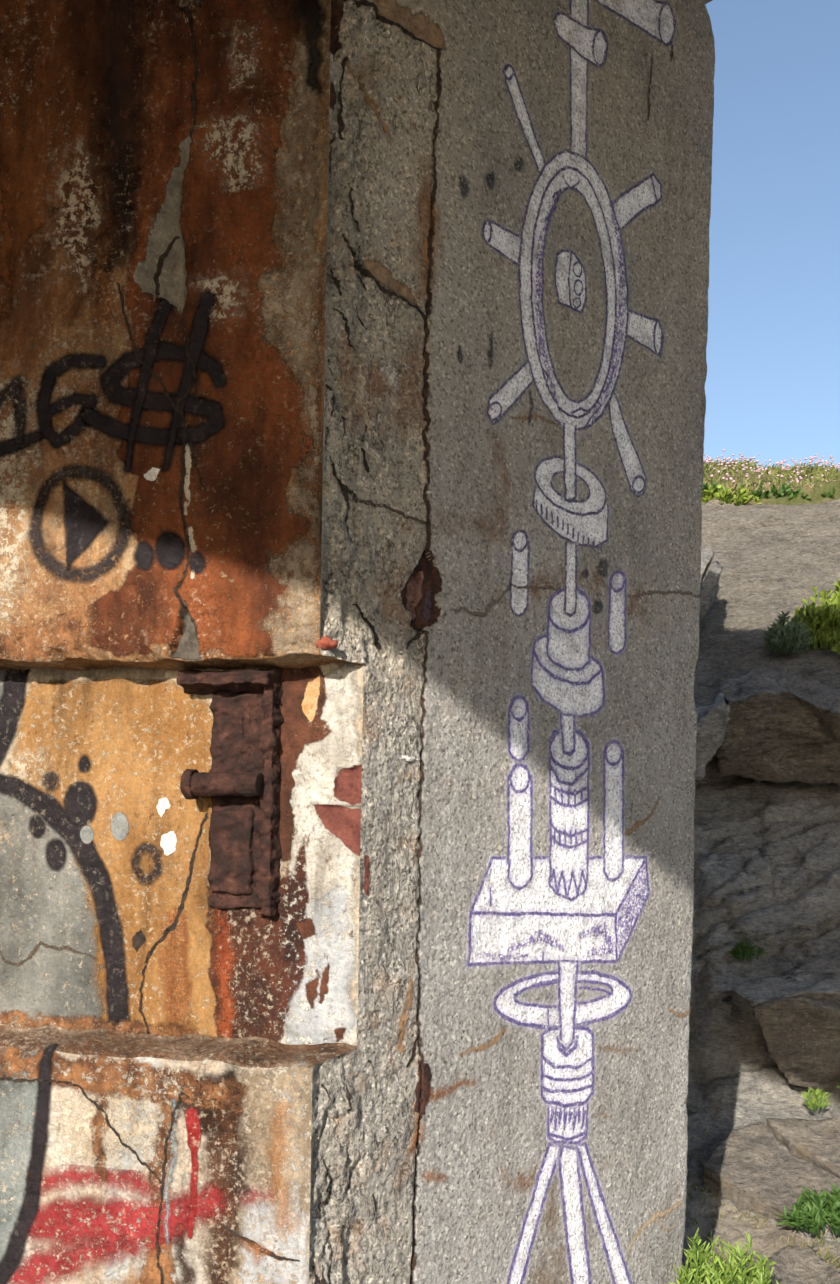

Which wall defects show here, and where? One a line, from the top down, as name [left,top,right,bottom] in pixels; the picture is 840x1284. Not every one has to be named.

spalling [133,135,192,313]
flaking render [259,0,445,652]
crack [331,50,442,552]
rust [0,0,331,1042]
crack [453,576,701,617]
flaking render [276,663,370,1045]
crack [352,604,429,1068]
rust [0,1045,248,1284]
crack [220,1223,300,1262]
rust [269,1109,288,1227]
flaking render [236,1064,352,1284]
crack [410,1112,423,1284]